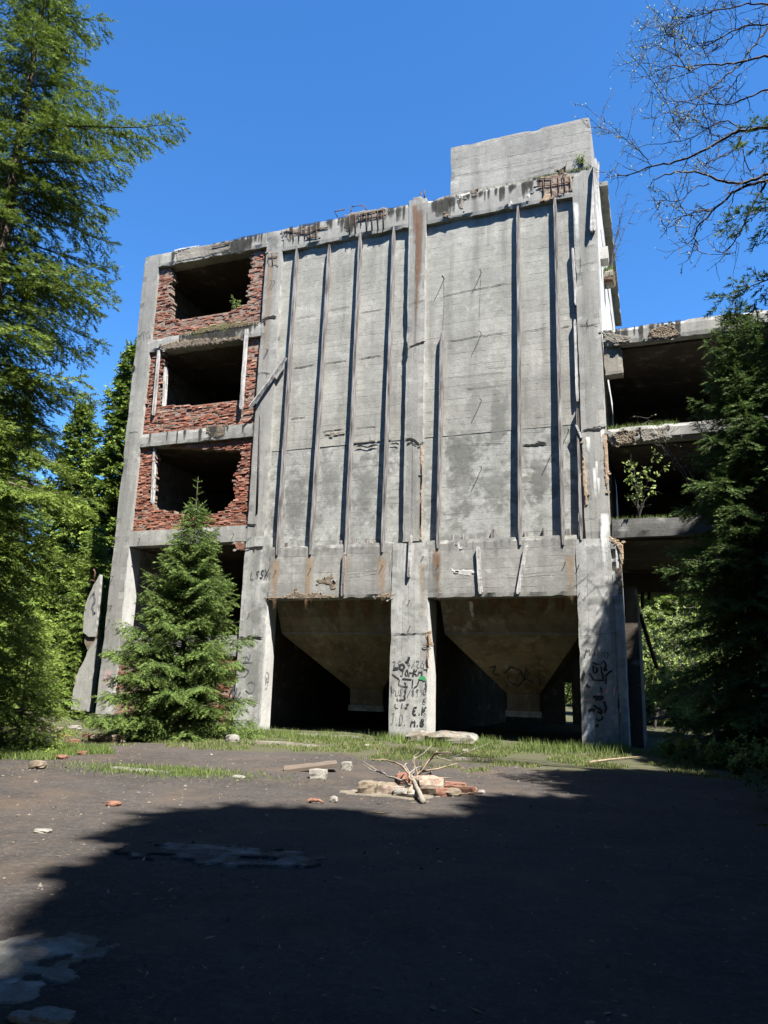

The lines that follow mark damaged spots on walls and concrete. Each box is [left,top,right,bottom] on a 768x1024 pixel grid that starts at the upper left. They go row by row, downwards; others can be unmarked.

water stain [432,179,545,216]
rust [413,206,422,320]
spalling [599,323,682,346]
spalling [602,424,672,493]